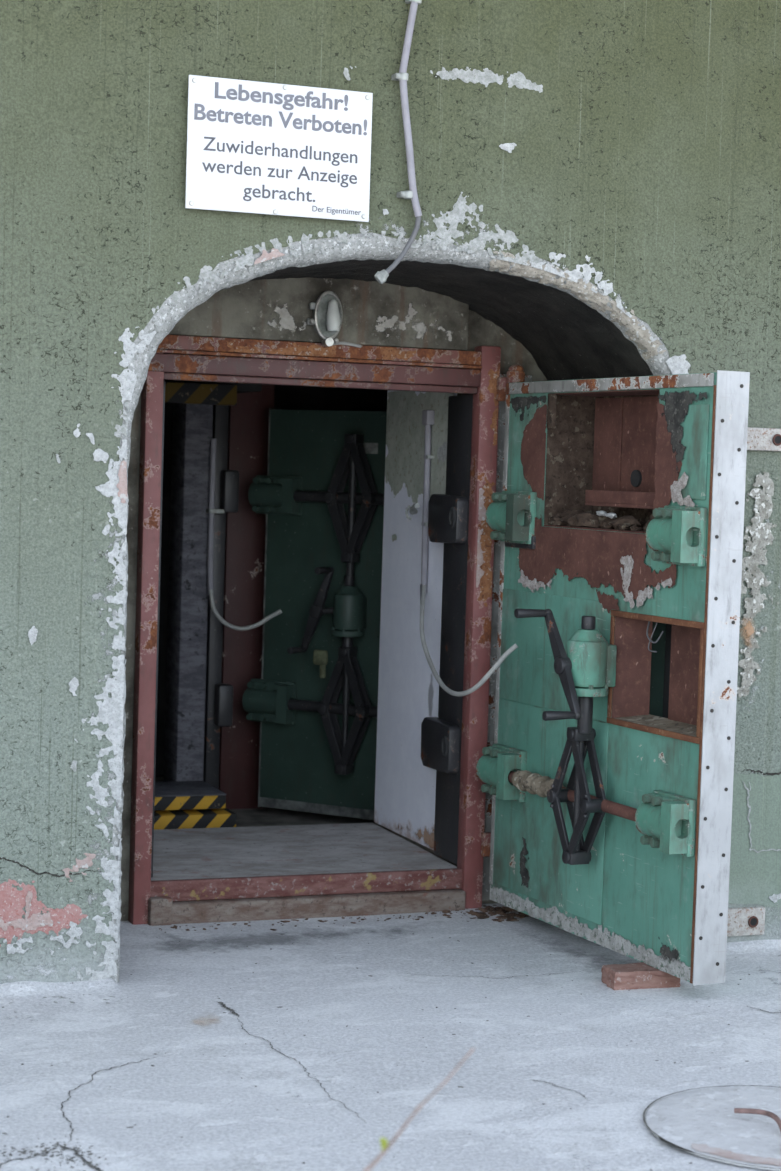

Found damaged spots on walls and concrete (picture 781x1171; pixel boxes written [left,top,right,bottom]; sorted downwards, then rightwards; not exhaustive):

corrosion [218,341,337,357]
corrosion [380,347,416,360]
spalling [0,192,691,981]
corrosion [476,477,495,607]
corrosion [521,404,547,500]
corrosion [519,514,677,600]
corrosion [653,402,682,510]
peeling [670,472,698,507]
spalling [737,460,779,701]
crack [742,769,781,853]
crack [0,1055,162,1171]
crack [218,1002,365,1121]